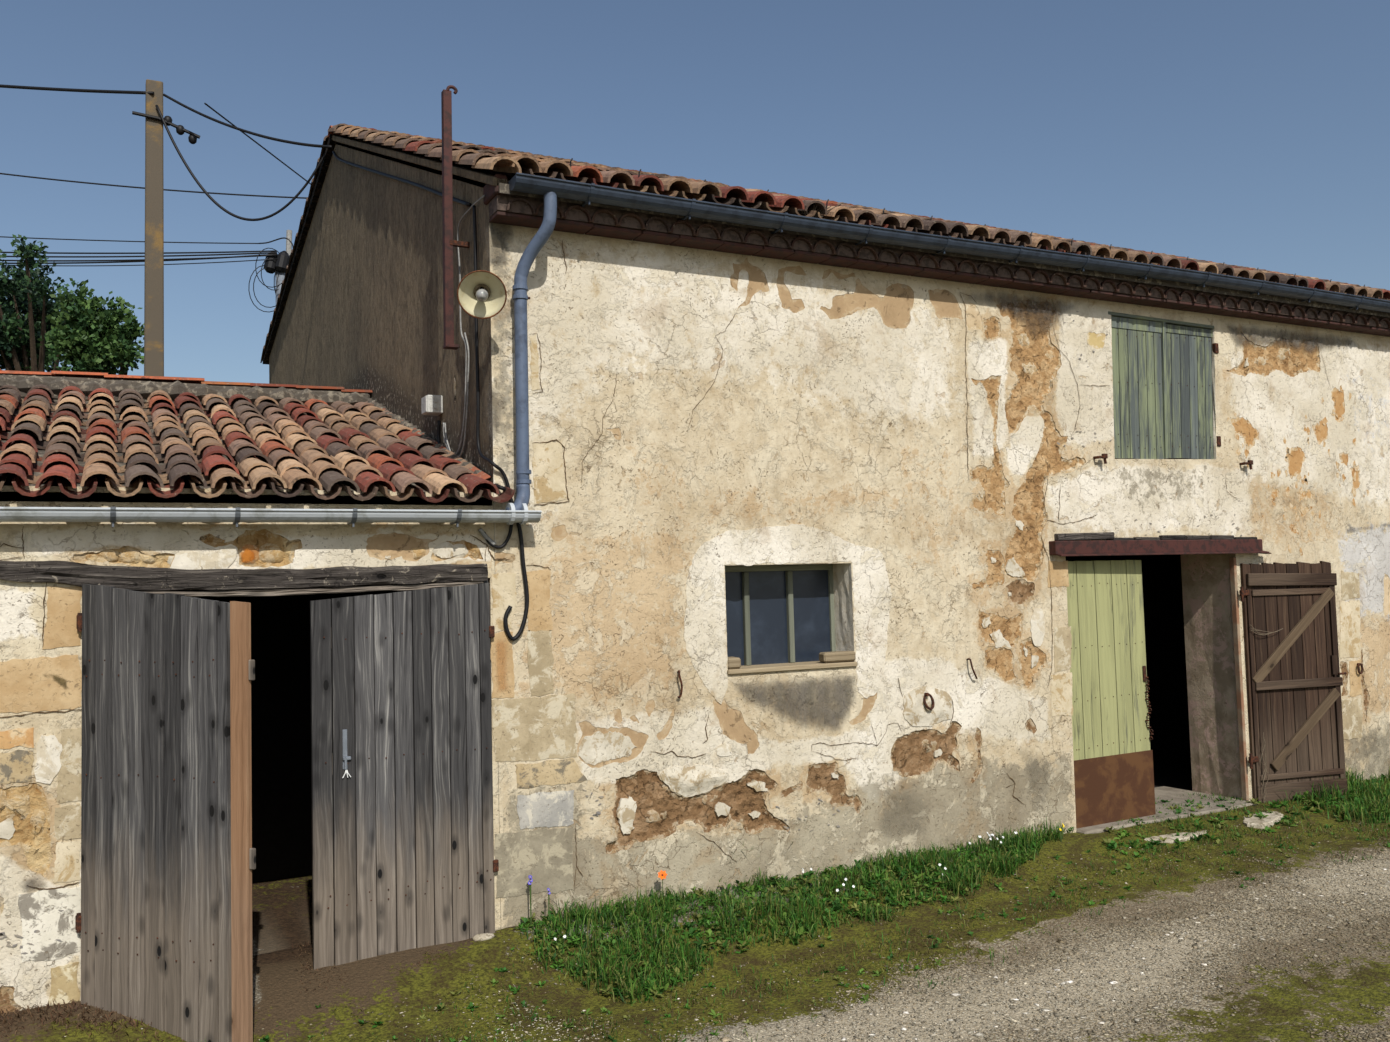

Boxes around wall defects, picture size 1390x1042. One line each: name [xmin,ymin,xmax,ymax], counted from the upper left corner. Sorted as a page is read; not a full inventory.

spalling [1227,332,1321,377]
spalling [730,258,1112,688]
peeling [1198,385,1369,556]
damp [742,680,851,727]
spalling [577,699,862,854]
spalling [890,721,983,783]
spalling [0,783,53,878]